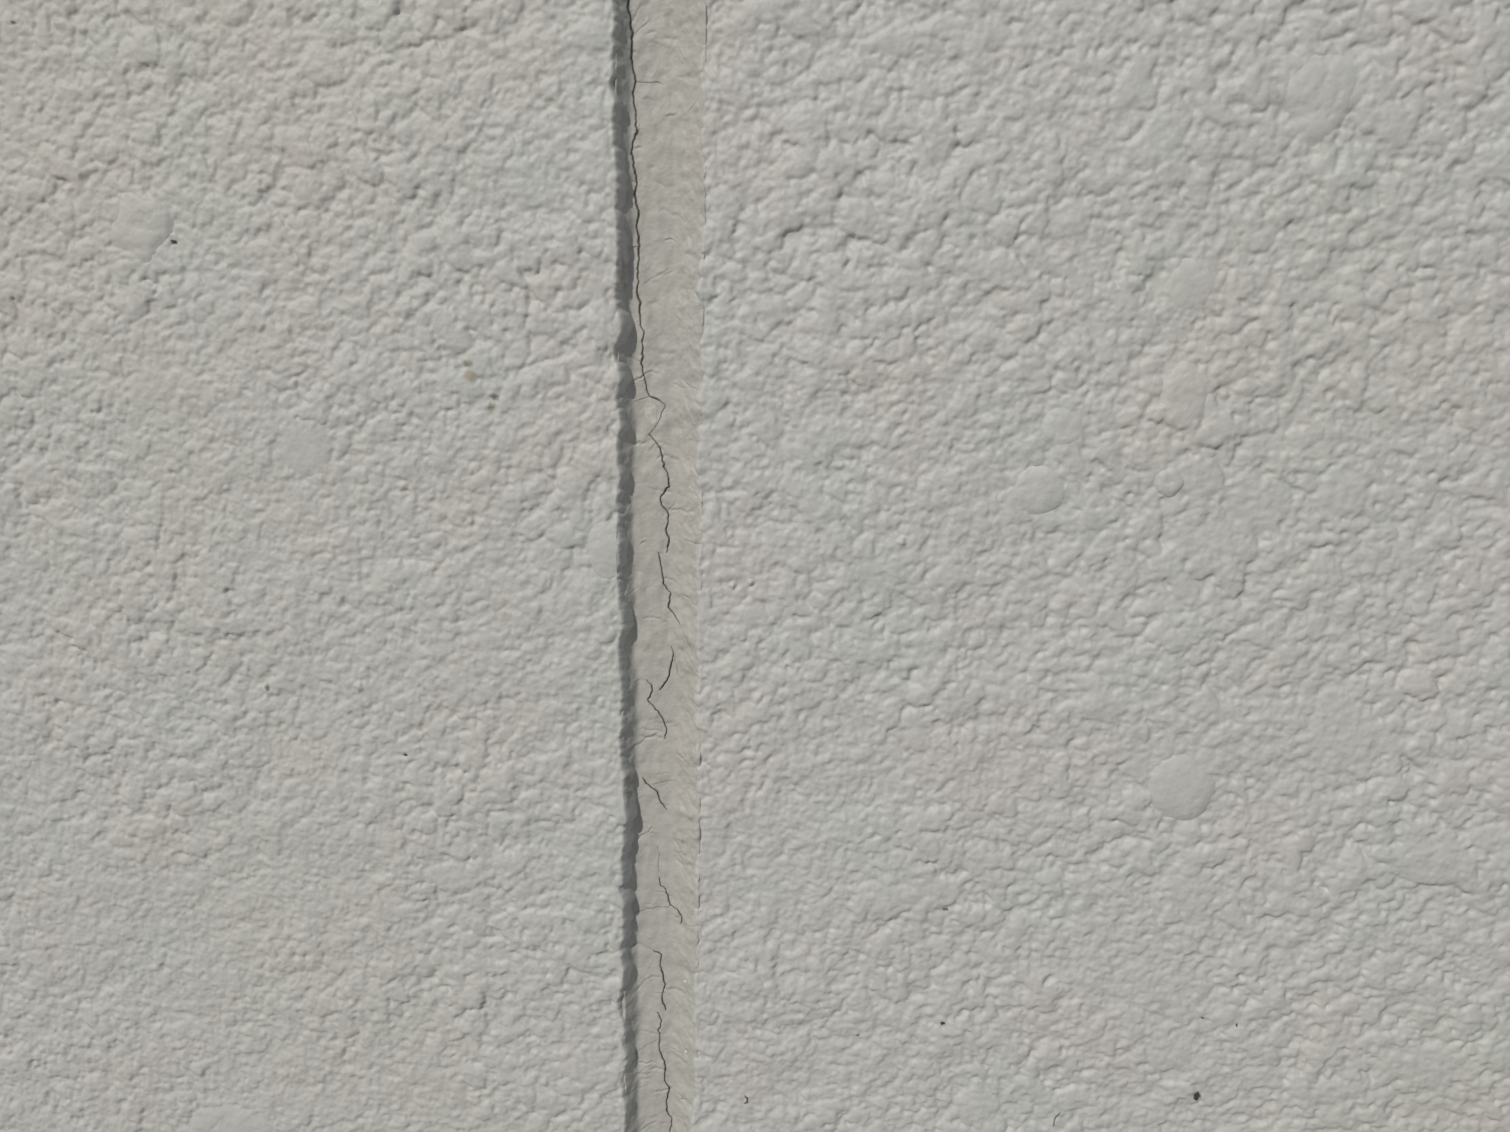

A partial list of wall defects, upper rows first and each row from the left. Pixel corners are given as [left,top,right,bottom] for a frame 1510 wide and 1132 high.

crack [627,0,693,735]
crack [632,847,682,1129]